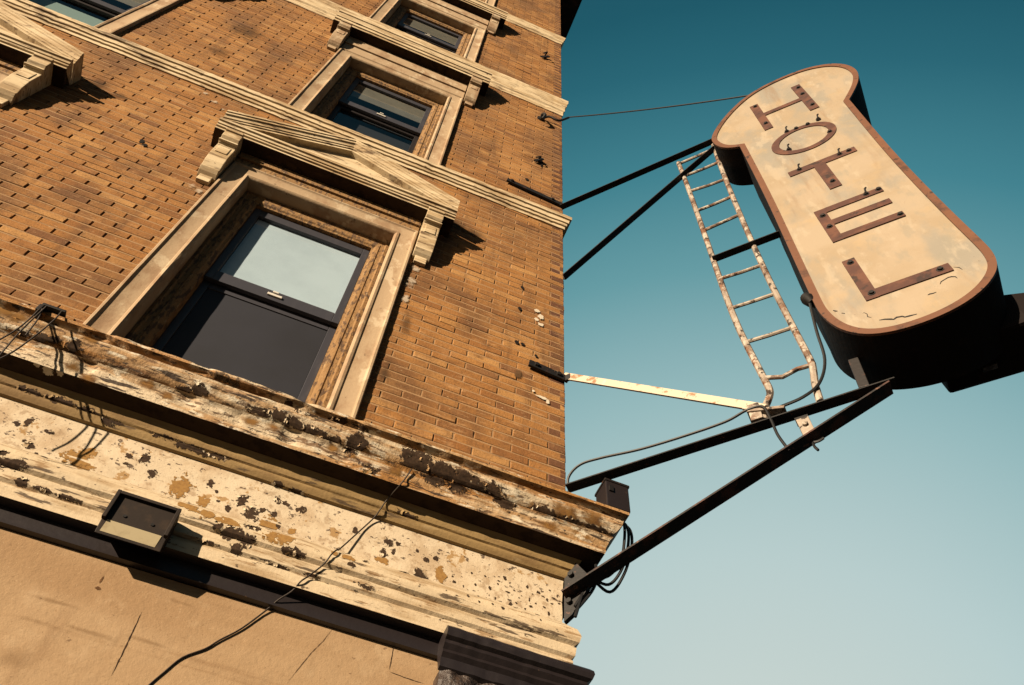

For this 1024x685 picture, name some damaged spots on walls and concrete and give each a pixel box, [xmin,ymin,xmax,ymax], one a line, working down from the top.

peeling [0,439,98,505]
peeling [15,385,124,427]
peeling [123,450,158,478]
peeling [149,432,229,462]
peeling [164,472,307,570]
peeling [243,399,381,476]
peeling [399,447,607,534]
peeling [331,538,560,621]
crack [113,612,142,672]